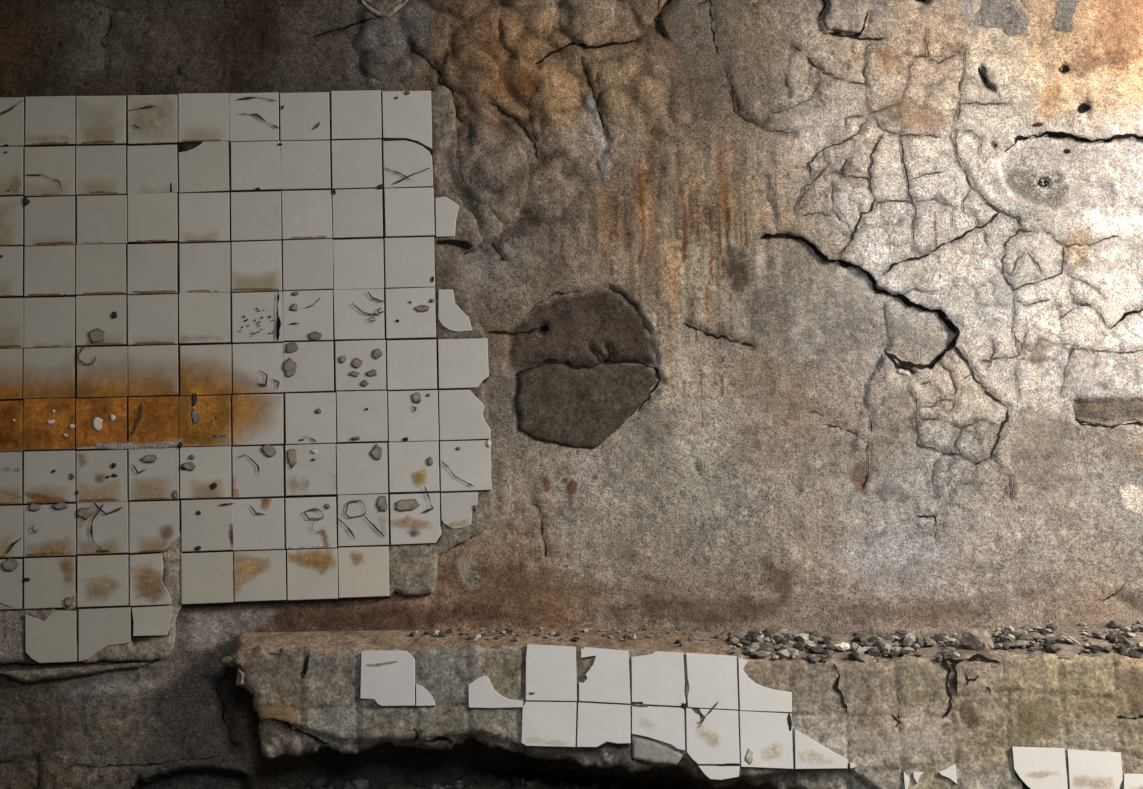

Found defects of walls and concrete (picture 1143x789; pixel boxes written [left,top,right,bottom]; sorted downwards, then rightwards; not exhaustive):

crack [536,0,671,129]
crack [488,101,539,160]
crack [383,167,429,184]
crack [698,0,1143,540]
crack [489,287,652,335]
spalling [512,293,651,366]
crack [683,322,754,347]
crack [516,344,661,411]
rust [0,368,264,457]
spalling [1073,398,1143,425]
spalling [456,554,483,589]
peeling [717,748,753,766]